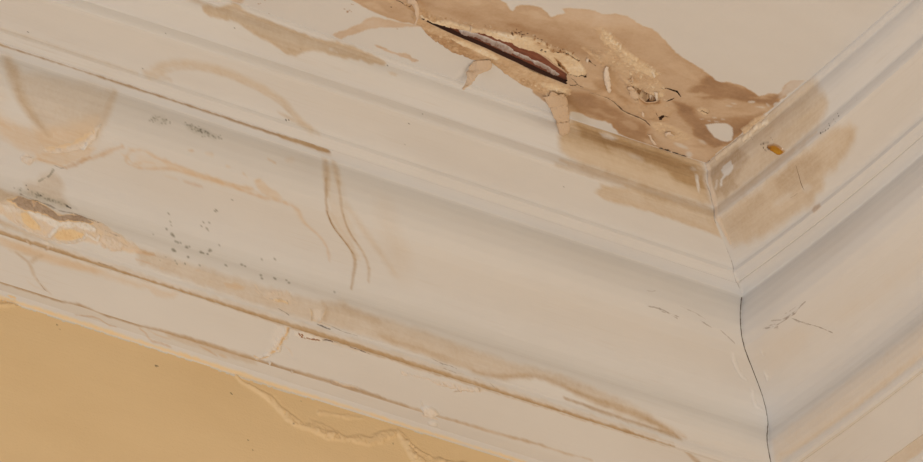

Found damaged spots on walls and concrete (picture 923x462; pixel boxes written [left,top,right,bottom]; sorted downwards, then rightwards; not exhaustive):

leakage [0,24,323,140]
leakage [0,49,333,264]
leakage [178,0,861,252]
flaking render [381,0,695,146]
peeling [253,324,324,365]
leakage [0,154,702,462]
crack [646,162,834,462]